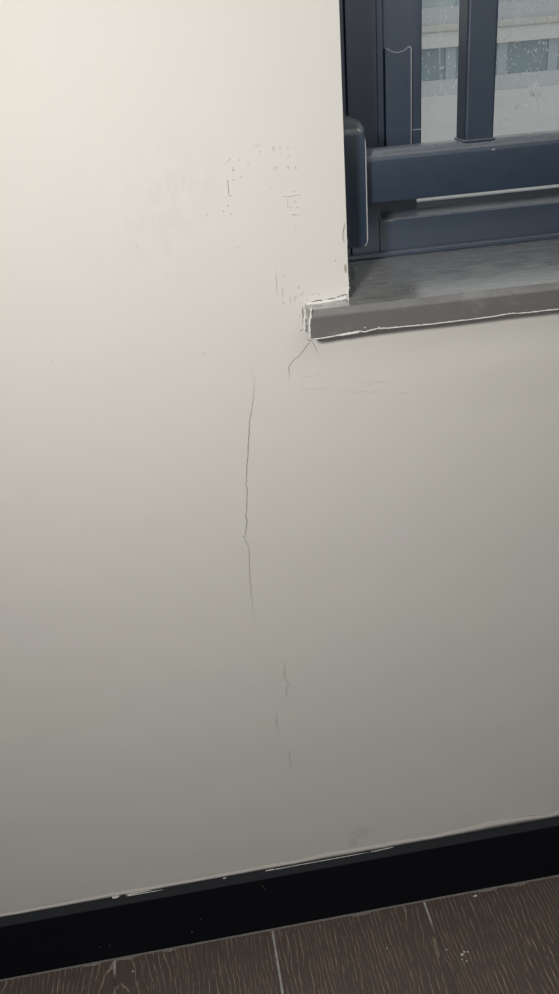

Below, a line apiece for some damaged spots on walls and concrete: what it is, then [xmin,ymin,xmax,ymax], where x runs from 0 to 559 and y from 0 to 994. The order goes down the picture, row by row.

crack [244,403,253,586]